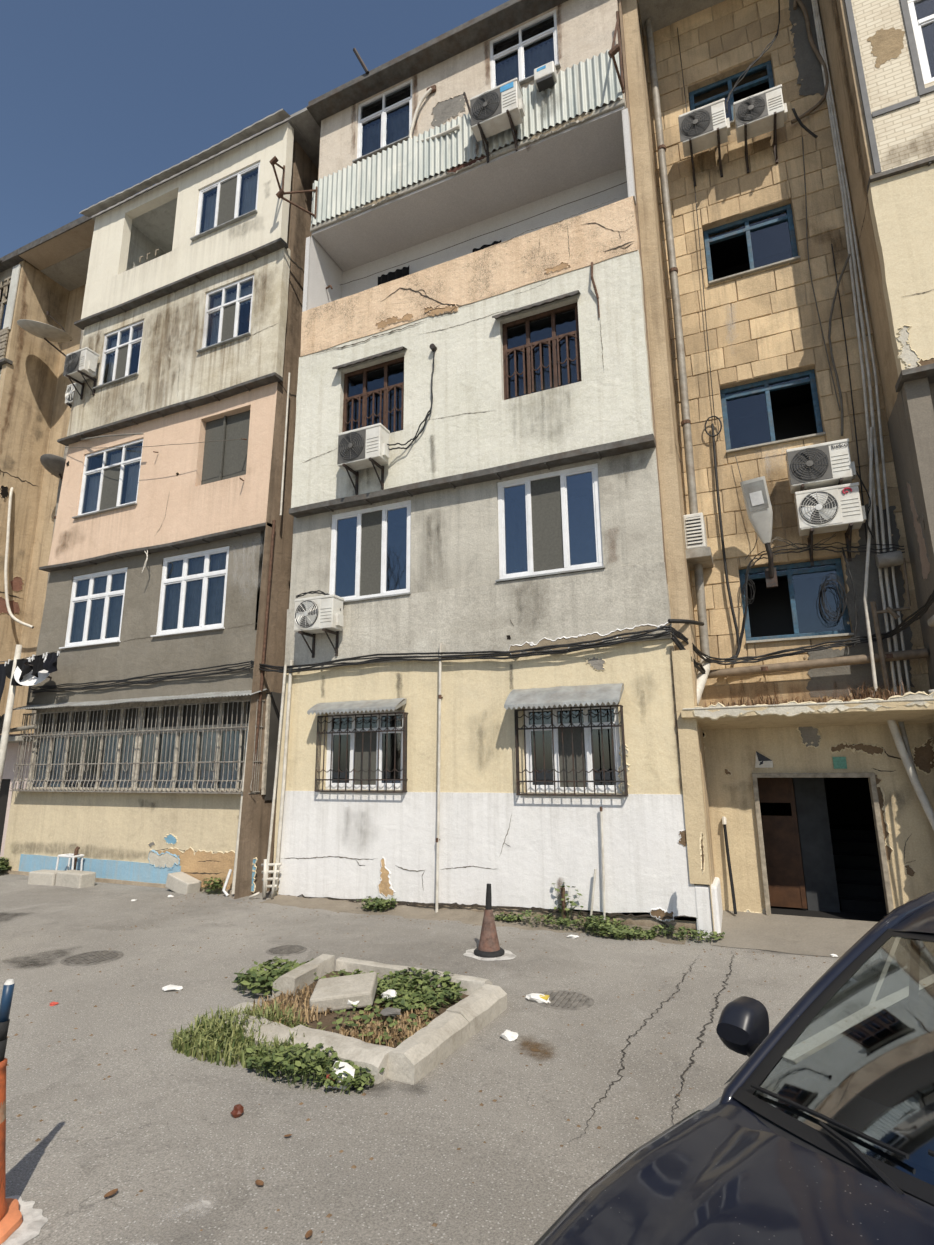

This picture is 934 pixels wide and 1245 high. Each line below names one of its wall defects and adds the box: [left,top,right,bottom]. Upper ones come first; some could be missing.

peeling [867,27,906,68]
crack [318,201,633,353]
spalling [375,303,458,330]
peeling [896,325,934,369]
spalling [0,576,24,615]
peeling [508,622,672,672]
peeling [692,691,934,756]
peeling [872,774,916,877]
spalling [148,833,235,890]
peeling [377,857,395,898]
crack [569,957,699,1145]
crack [671,951,735,1125]